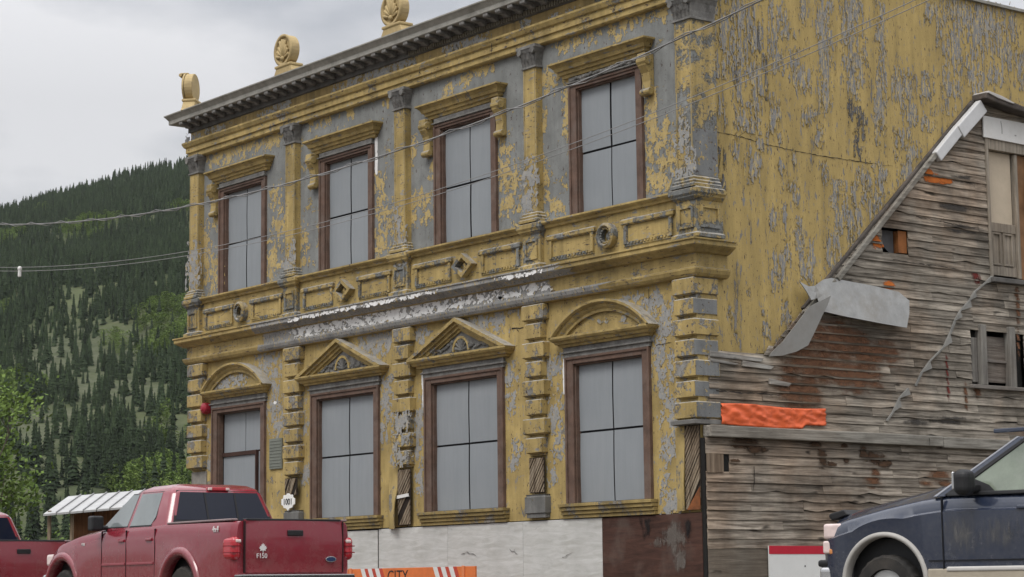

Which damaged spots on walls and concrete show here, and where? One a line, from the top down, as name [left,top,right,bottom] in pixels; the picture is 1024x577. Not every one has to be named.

peeling [206,133,283,169]
peeling [498,6,669,228]
peeling [644,86,697,195]
crack [718,131,890,166]
peeling [715,0,1024,340]
peeling [185,209,225,296]
peeling [214,262,702,526]